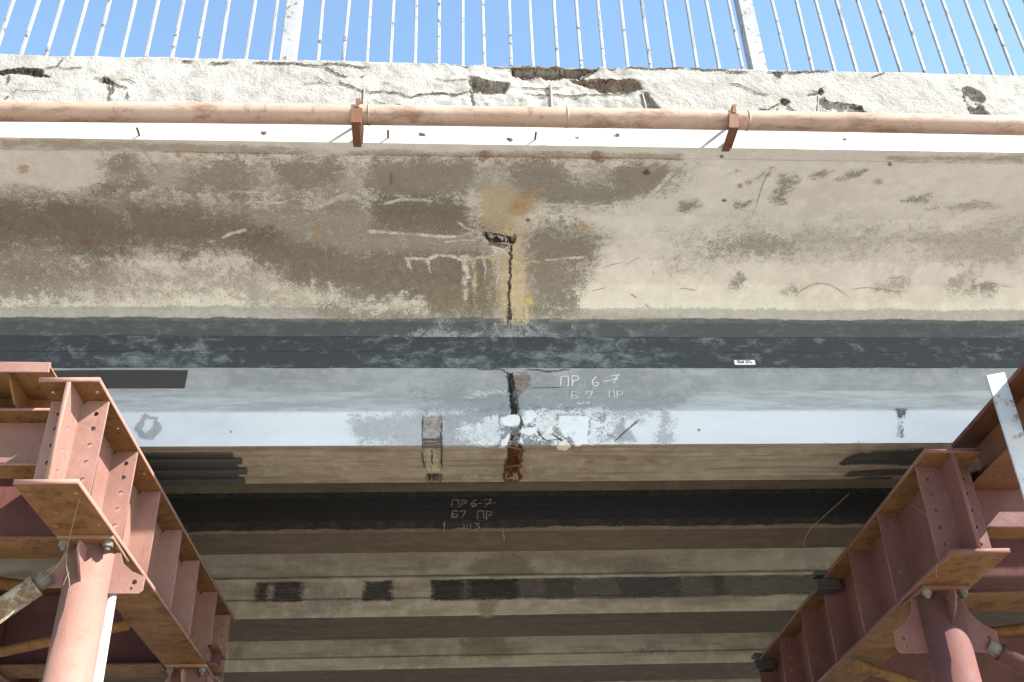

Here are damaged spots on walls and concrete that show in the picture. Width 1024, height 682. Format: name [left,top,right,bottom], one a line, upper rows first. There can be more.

spalling [0,59,81,82]
spalling [94,77,136,101]
spalling [469,66,661,109]
spalling [953,86,991,115]
leakage [0,151,702,337]
spalling [482,232,514,249]
crack [506,234,516,326]
corrosion [495,234,534,325]